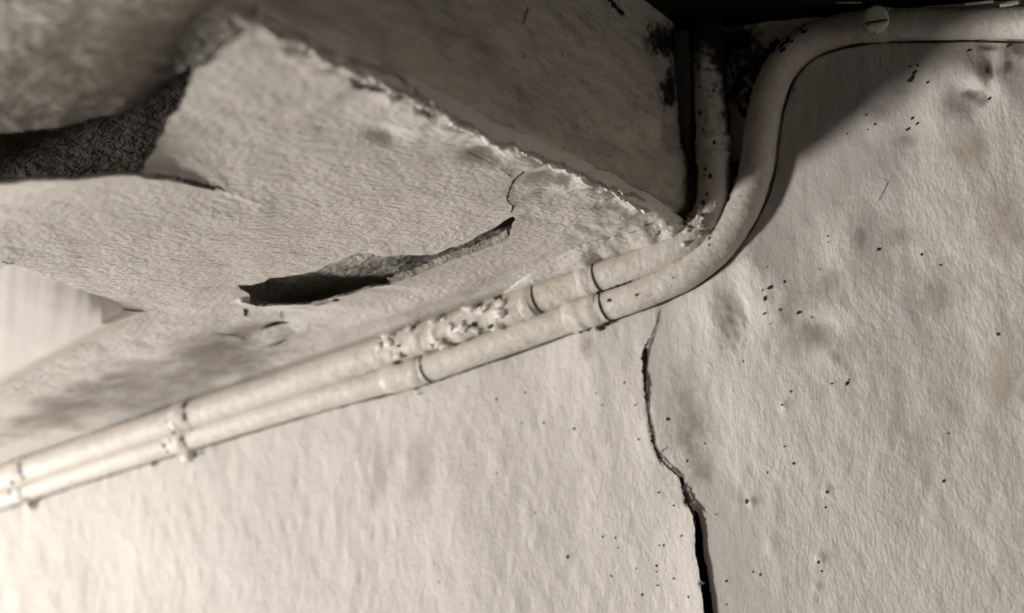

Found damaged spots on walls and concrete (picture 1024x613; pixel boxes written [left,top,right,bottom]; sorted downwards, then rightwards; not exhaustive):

peeling [0,0,717,350]
crack [501,164,531,212]
damp [643,15,807,184]
peeling [0,259,148,389]
peeling [375,324,416,365]
crack [641,309,714,613]